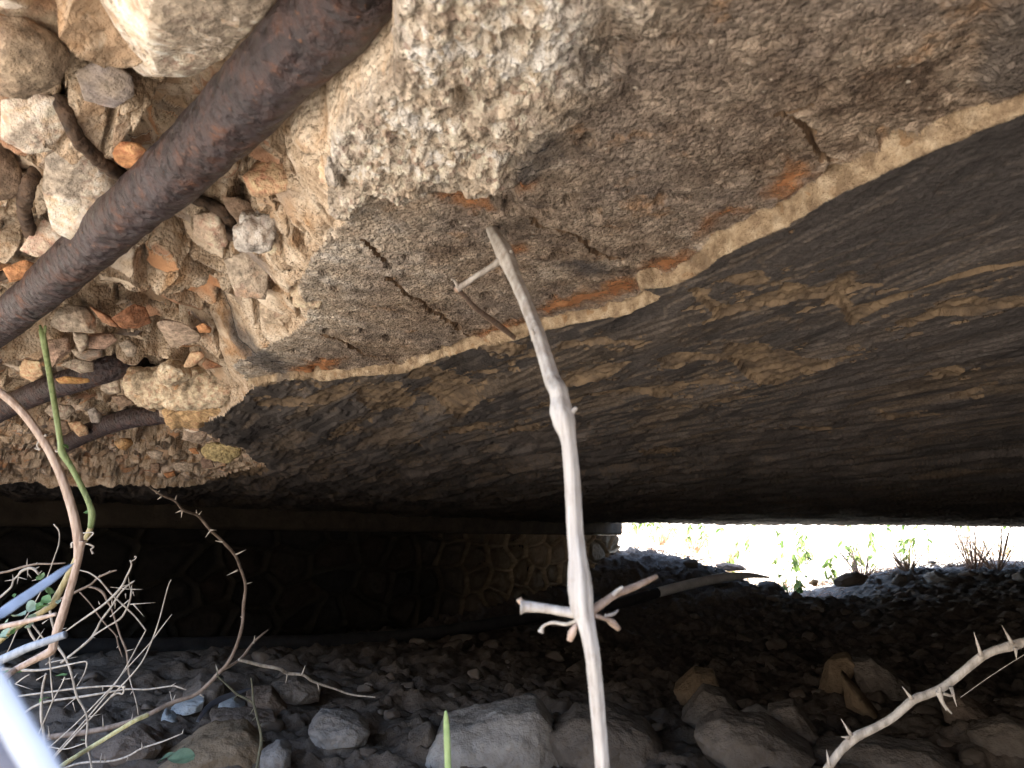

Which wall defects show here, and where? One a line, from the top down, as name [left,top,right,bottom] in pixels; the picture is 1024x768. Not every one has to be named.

crack [773,103,839,163]
crack [360,239,471,337]
peeling [0,0,1024,489]
rust [537,279,635,313]